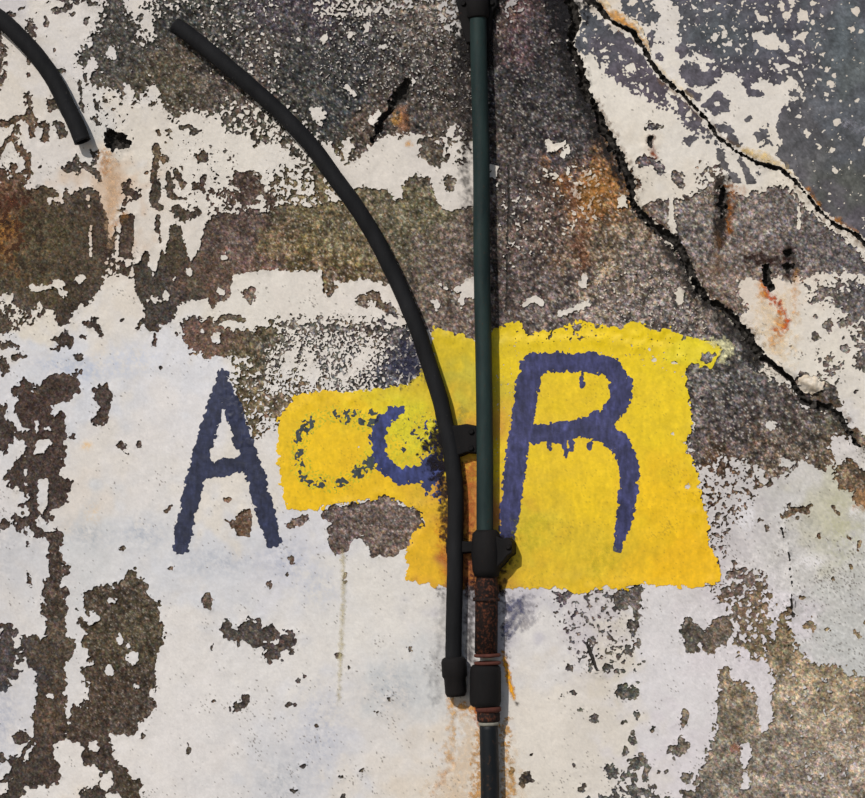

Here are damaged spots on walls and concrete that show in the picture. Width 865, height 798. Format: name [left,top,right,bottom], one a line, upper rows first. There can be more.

spalling [0,0,475,798]
spalling [487,0,865,798]
crack [564,0,865,450]
corrosion [743,245,792,281]
corrosion [760,280,790,332]
corrosion [474,651,518,704]